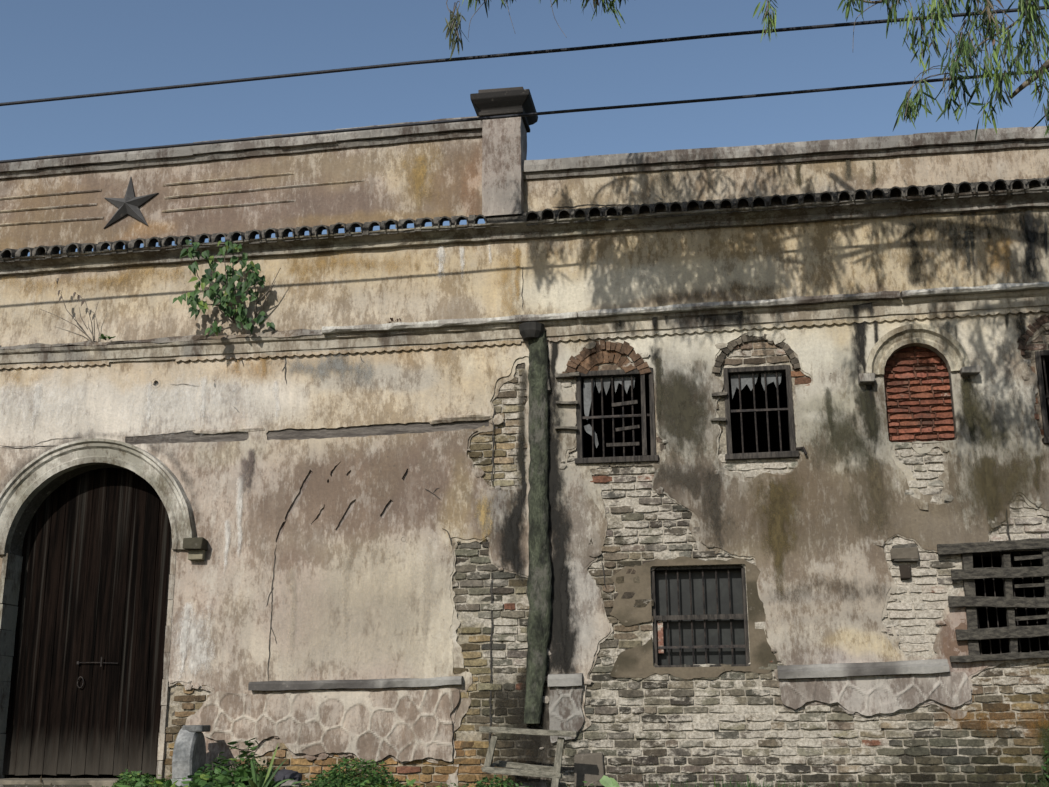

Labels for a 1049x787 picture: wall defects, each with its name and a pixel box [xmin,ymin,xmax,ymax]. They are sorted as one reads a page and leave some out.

damp [903,210,1049,285]
damp [651,348,709,448]
damp [826,300,889,525]
crack [267,549,276,680]
damp [493,342,576,779]
flaking render [237,323,1049,787]
damp [657,462,721,545]
damp [757,481,797,593]
flaking render [159,680,215,781]